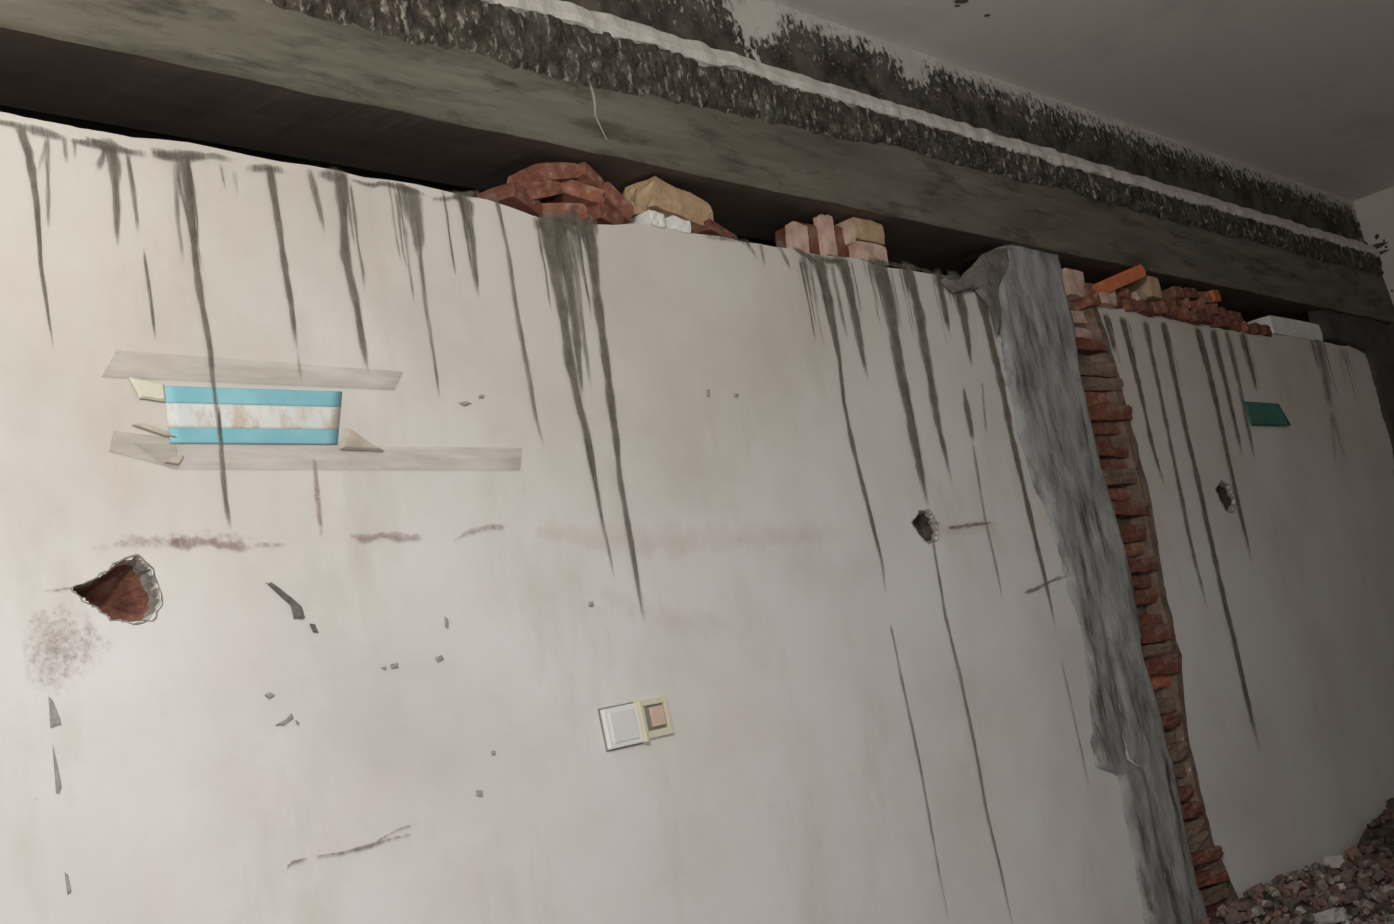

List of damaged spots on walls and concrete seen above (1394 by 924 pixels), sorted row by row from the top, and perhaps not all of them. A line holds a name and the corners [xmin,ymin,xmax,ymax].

damp [0,120,138,325]
spalling [69,554,163,625]
damp [153,149,229,516]
damp [252,165,296,334]
damp [309,170,428,360]
damp [535,206,641,602]
damp [781,248,1052,610]
spalling [911,509,939,545]
damp [560,0,1365,243]
spalling [1068,283,1272,920]
damp [1104,315,1259,729]
crack [288,836,400,867]